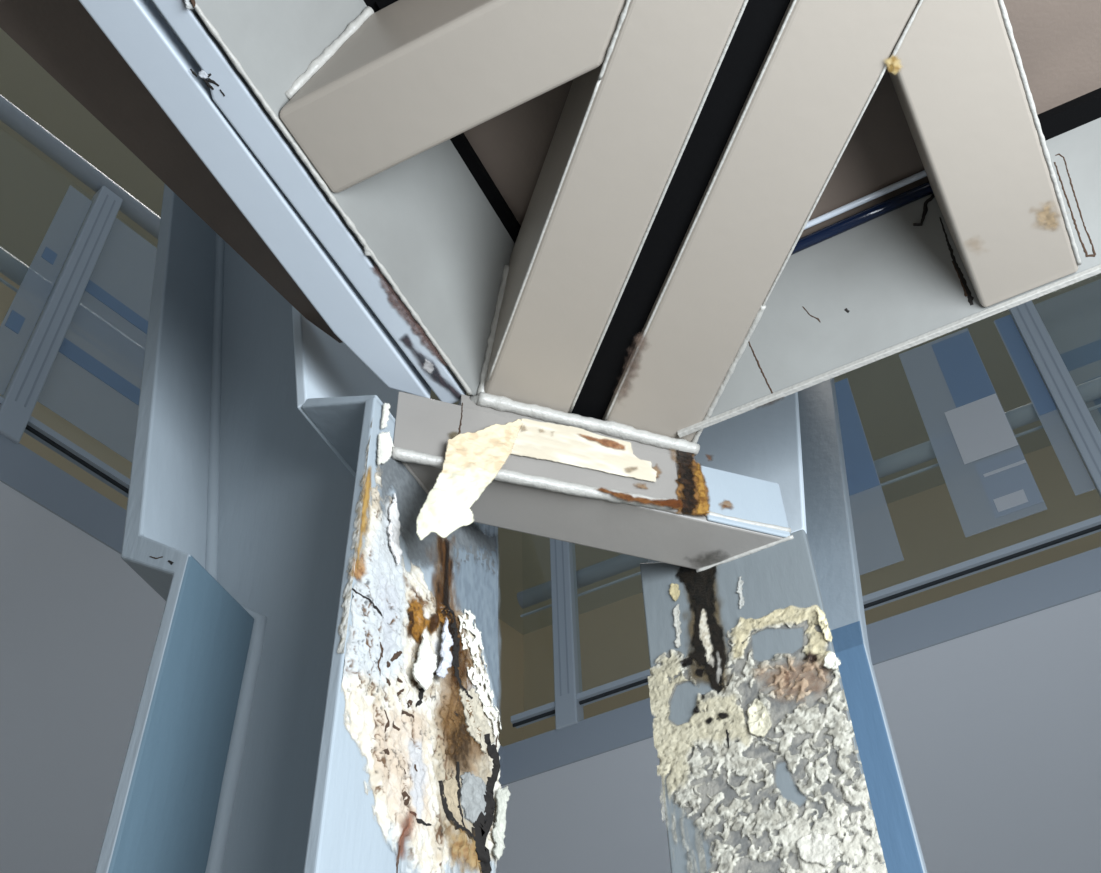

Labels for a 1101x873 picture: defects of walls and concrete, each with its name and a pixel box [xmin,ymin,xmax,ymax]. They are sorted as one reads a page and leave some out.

crack [939,217,974,306]
crack [1054,154,1096,257]
rust [373,268,461,399]
rust [598,450,732,515]
crack [352,588,382,616]
peeling [337,403,511,873]
rust [406,537,481,768]
crack [377,604,500,873]
peeling [648,576,888,873]